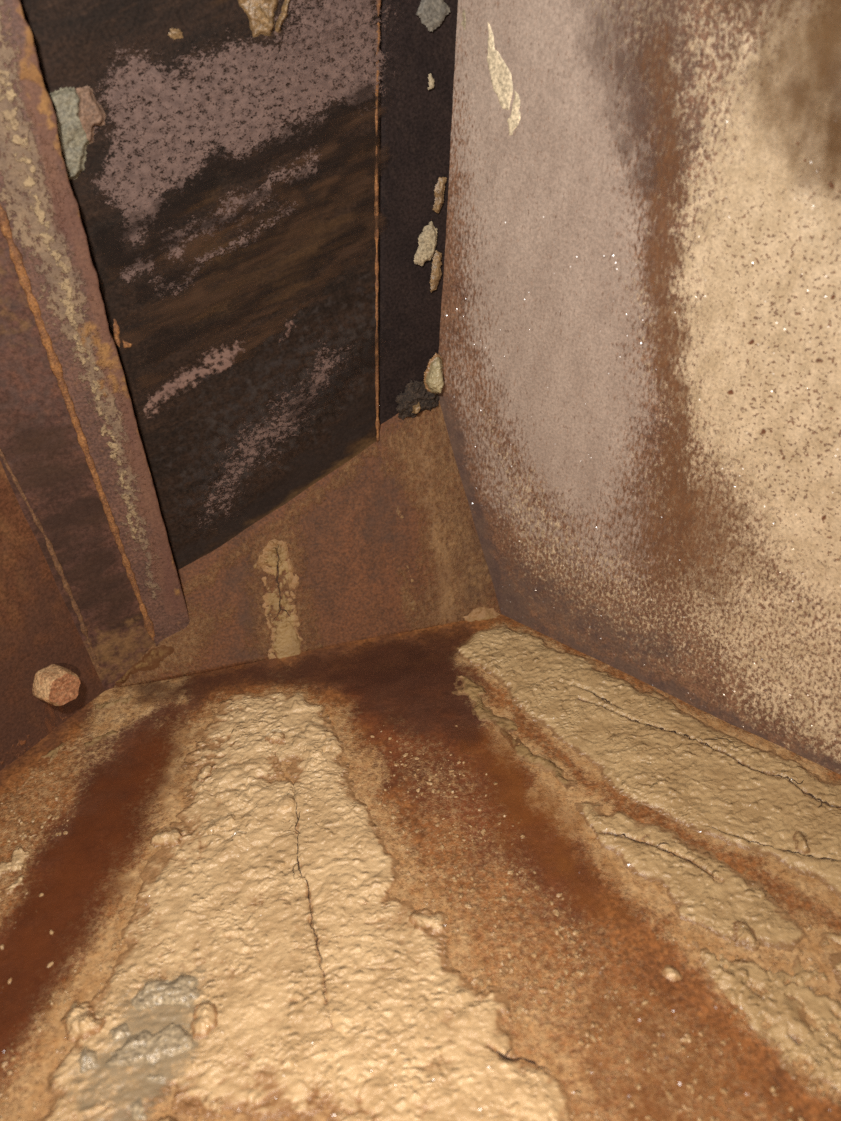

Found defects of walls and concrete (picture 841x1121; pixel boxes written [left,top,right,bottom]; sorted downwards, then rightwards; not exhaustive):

rust [113,319,132,348]
rust [630,28,748,603]
crack [569,685,841,808]
rust [0,737,175,1034]
crack [292,785,332,1024]
crack [596,832,720,881]
crack [708,826,838,861]